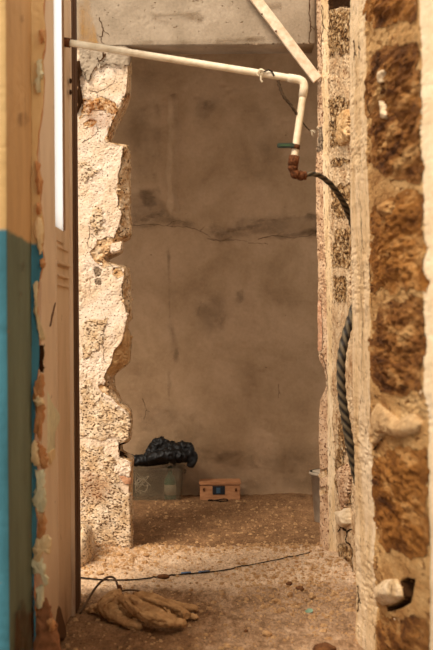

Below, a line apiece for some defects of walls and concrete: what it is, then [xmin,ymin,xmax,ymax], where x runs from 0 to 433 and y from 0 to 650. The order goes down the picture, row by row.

peeling [77,46,132,143]
spalling [88,147,133,321]
spalling [82,317,108,359]
spalling [31,281,66,650]
spalling [80,329,134,548]
spalling [374,577,429,650]